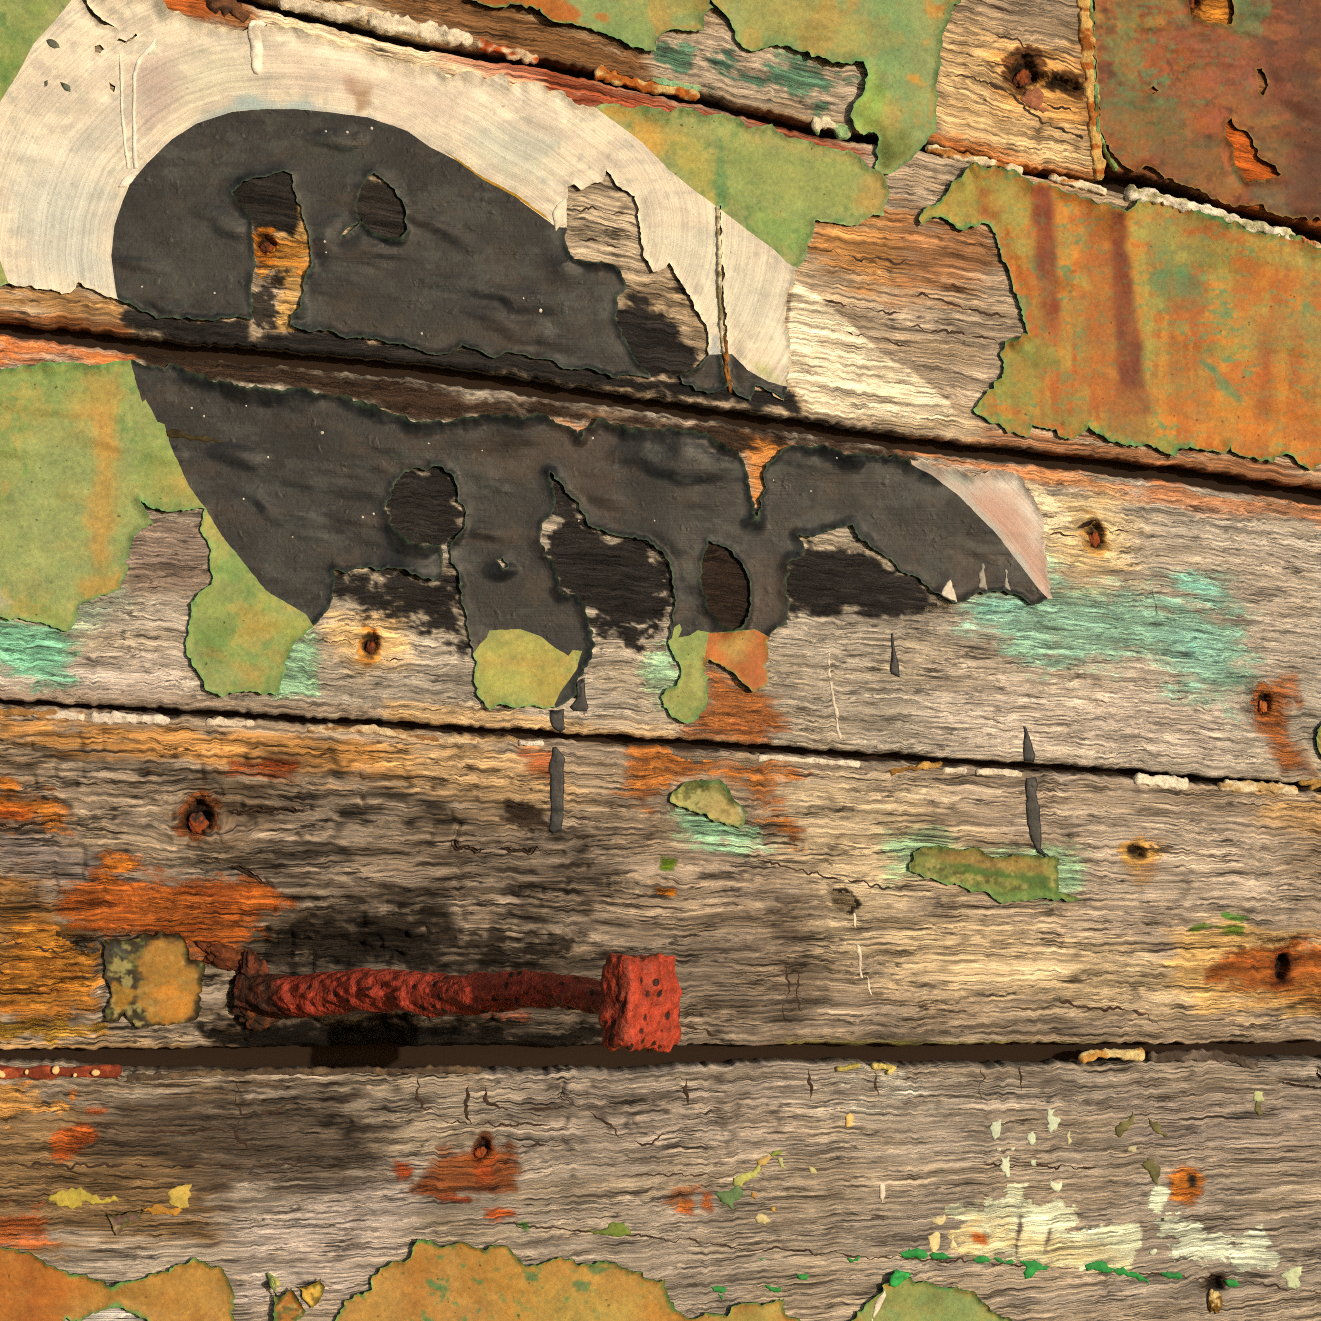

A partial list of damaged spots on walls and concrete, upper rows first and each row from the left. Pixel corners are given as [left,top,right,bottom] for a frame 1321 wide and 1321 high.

peeling [0,0,961,401]
peeling [918,0,1321,471]
peeling [0,359,1052,723]
corrosion [1249,676,1311,776]
corrosion [1205,934,1321,1009]
corrosion [482,1014,528,1022]
corrosion [395,1143,521,1221]
corrosion [1169,1167,1205,1204]
peeling [0,1247,236,1321]
peeling [270,1278,325,1321]
peeling [335,1239,801,1321]
peeling [851,1277,1012,1321]